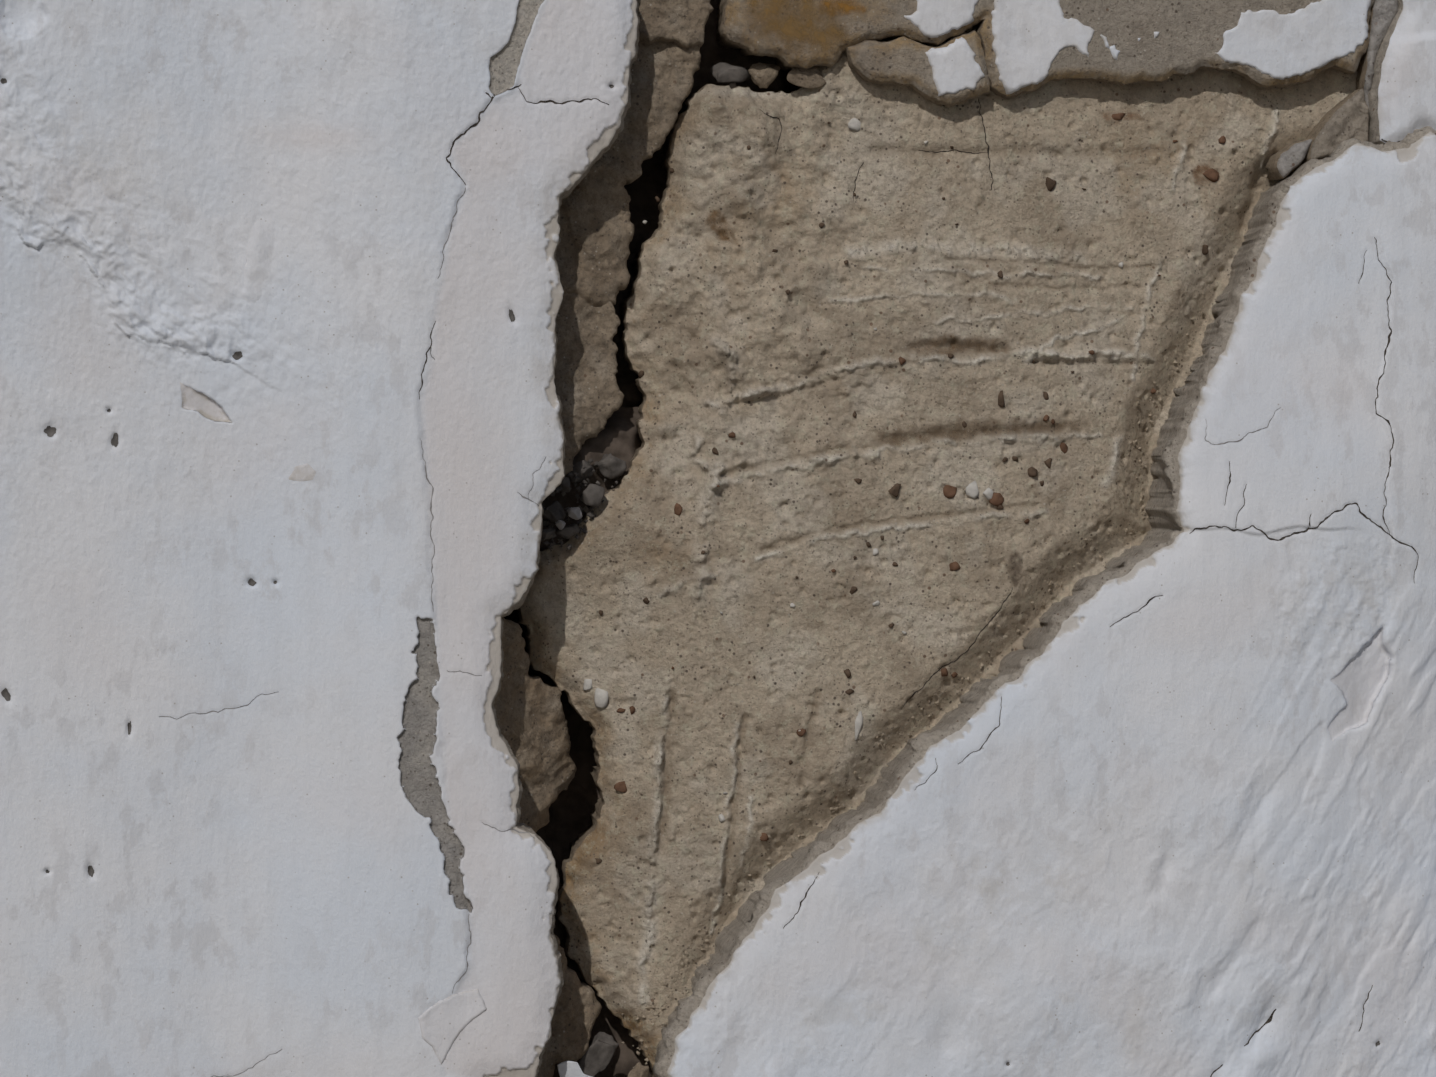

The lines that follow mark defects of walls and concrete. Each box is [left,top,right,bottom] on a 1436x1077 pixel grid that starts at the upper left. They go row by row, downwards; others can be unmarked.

crack [437,84,609,279]
crack [519,0,797,551]
spalling [489,0,1436,1077]
crack [1190,237,1419,583]
peeling [397,617,473,913]
crack [482,633,652,1077]